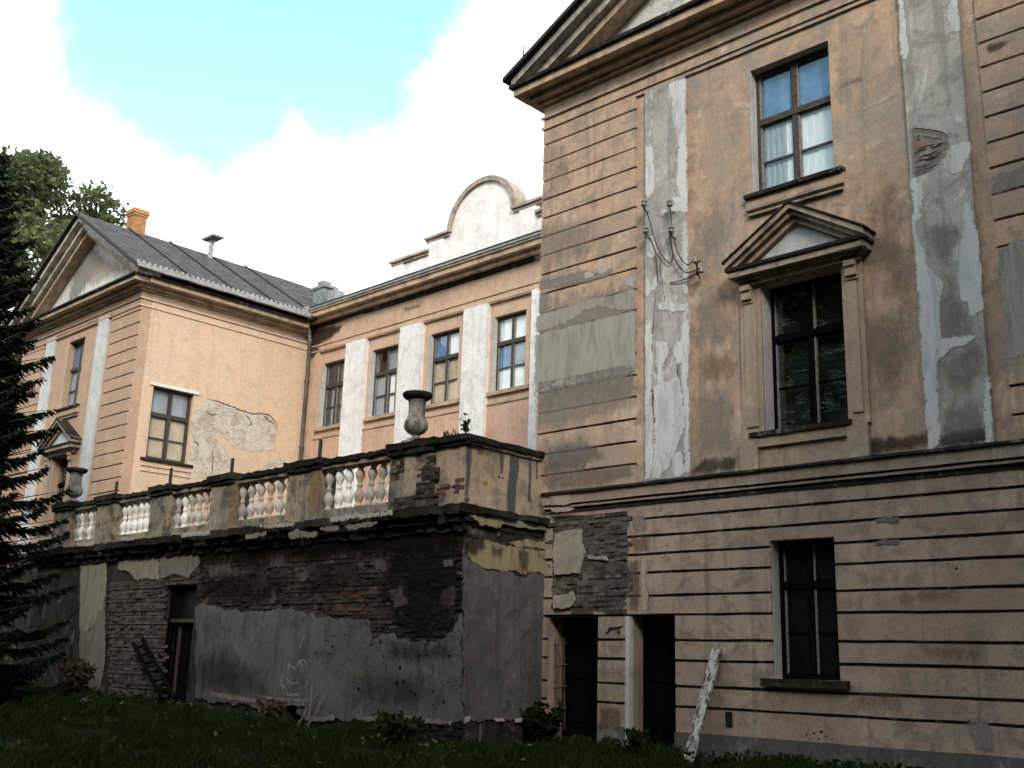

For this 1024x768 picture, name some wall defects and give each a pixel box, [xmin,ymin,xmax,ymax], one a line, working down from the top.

peeling [898,0,909,60]
peeling [946,0,960,32]
peeling [946,141,971,174]
peeling [538,265,613,312]
peeling [623,79,690,480]
peeling [909,178,976,449]
peeling [958,200,984,320]
peeling [186,400,290,480]
peeling [983,375,994,443]
flaking render [245,455,470,539]
flaking render [467,494,633,614]
flaking render [79,547,428,699]